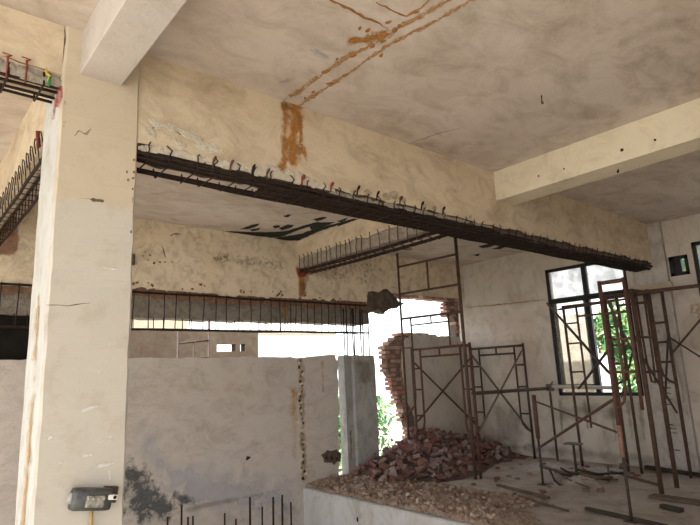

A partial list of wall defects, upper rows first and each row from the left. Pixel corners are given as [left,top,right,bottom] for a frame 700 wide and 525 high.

corrosion [349,31,392,44]
spalling [0,56,61,104]
corrosion [278,102,306,170]
spalling [0,156,42,246]
spalling [126,118,653,274]
spalling [0,282,32,295]
spalling [132,281,404,315]
corrosion [296,268,306,300]
damp [123,467,193,523]